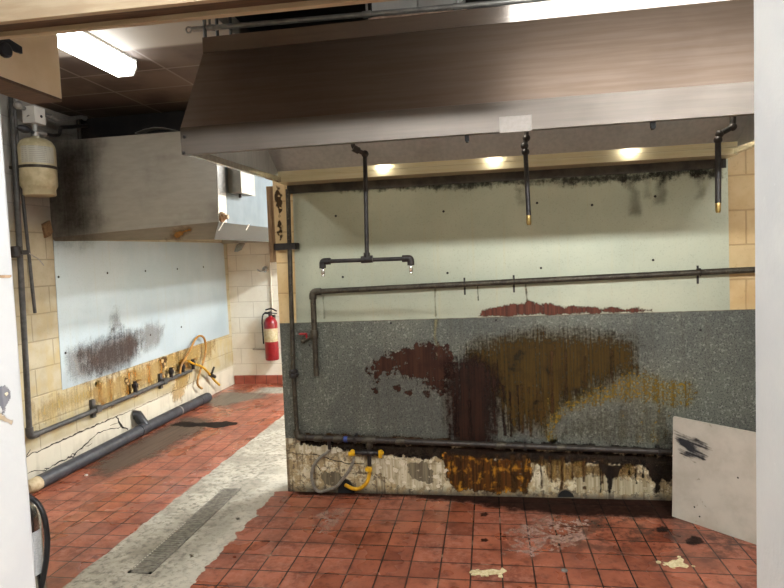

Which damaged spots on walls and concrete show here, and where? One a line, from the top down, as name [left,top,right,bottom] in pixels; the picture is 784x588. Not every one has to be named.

crack [26,374,194,473]
peeling [295,443,355,493]
peeling [363,454,448,491]
corrosion [326,340,640,495]